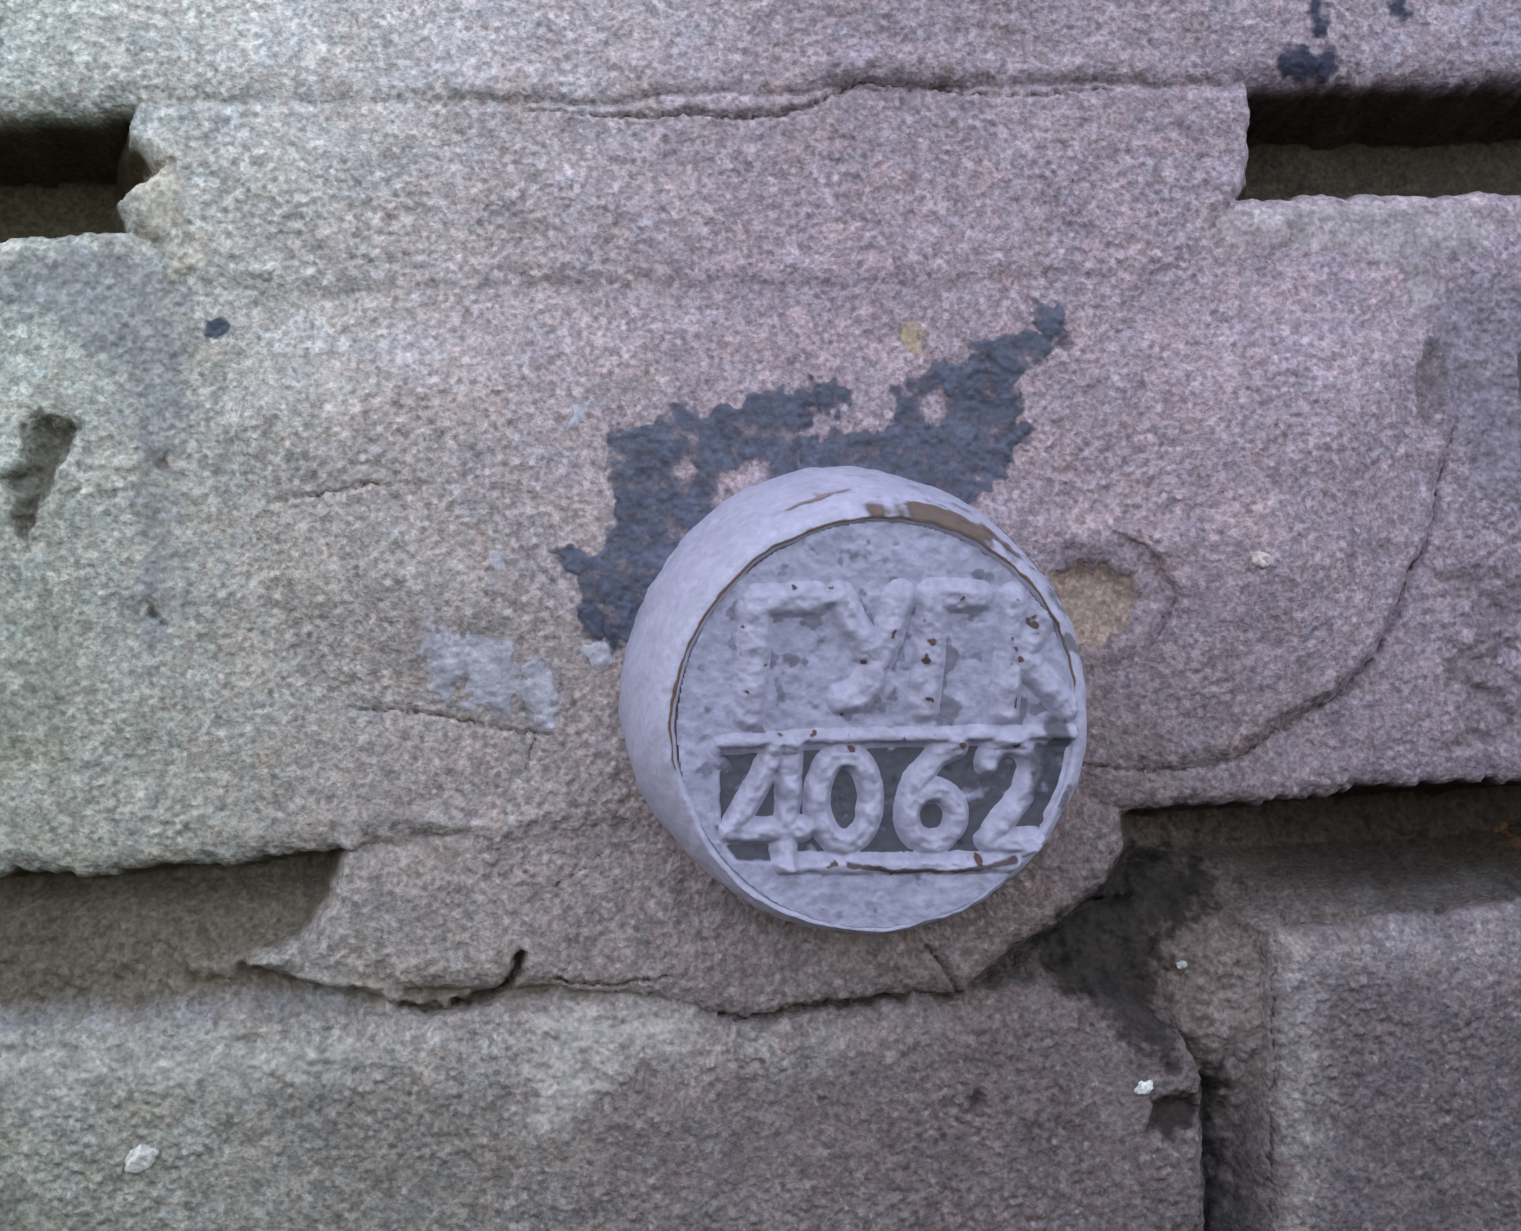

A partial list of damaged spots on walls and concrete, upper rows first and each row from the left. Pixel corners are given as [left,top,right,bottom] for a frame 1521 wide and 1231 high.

peeling [1033,304,1068,345]
peeling [561,392,589,431]
peeling [805,378,852,420]
peeling [549,544,592,575]
peeling [578,606,619,669]
crack [1094,765,1192,773]
crack [401,952,523,1012]
crack [555,975,667,986]